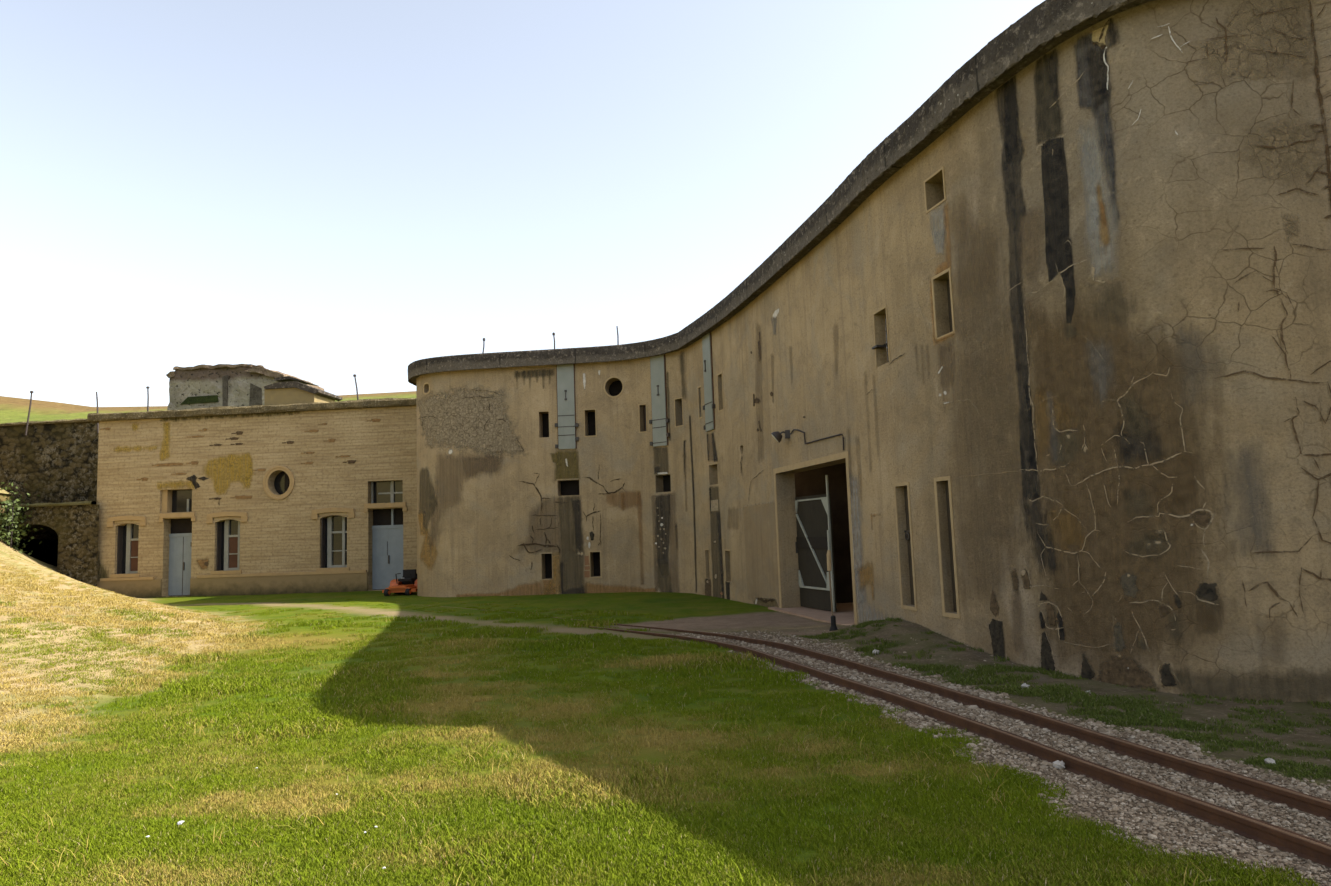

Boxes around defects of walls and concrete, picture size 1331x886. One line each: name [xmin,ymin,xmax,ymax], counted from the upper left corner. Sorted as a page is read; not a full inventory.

water stain [418,458,498,568]
water stain [997,18,1216,657]
crack [980,0,1331,672]